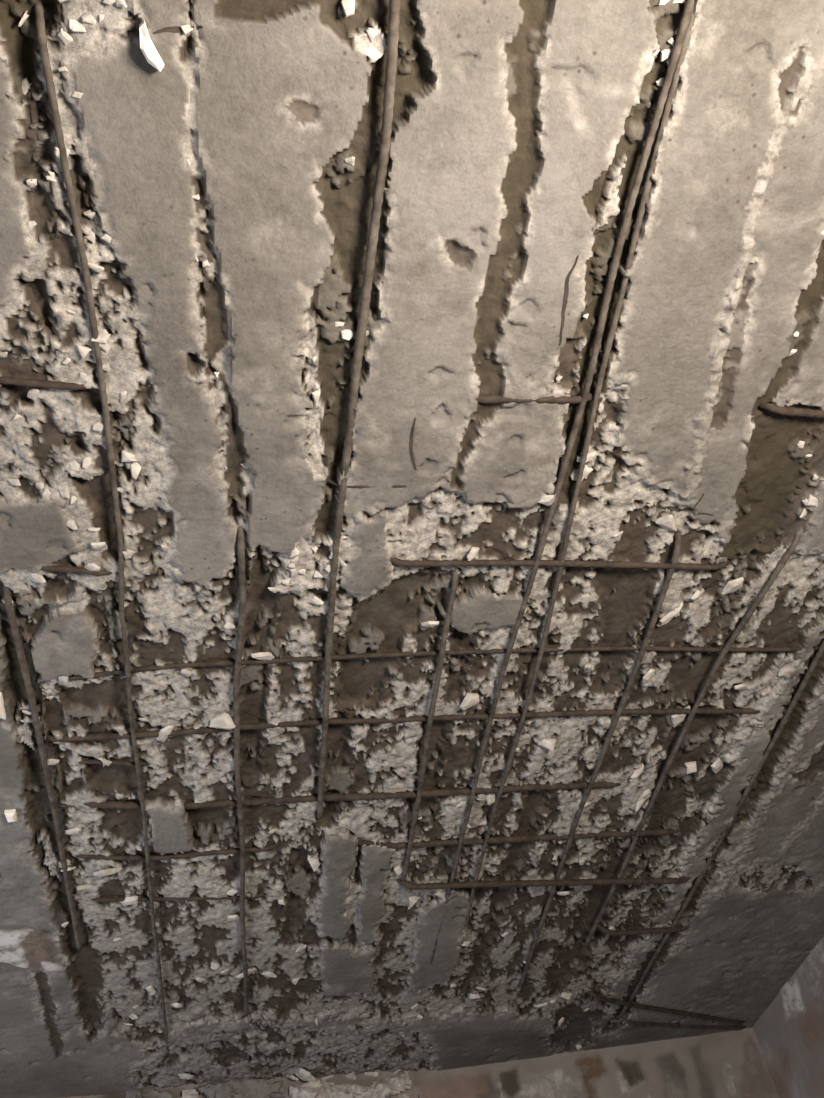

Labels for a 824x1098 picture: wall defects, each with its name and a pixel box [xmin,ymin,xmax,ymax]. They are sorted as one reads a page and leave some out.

spalling [353,0,438,429]
spalling [473,0,556,397]
spalling [551,0,686,396]
spalling [778,47,807,119]
spalling [0,0,389,855]
spalling [0,582,682,1098]
spalling [324,516,533,796]
spalling [364,400,593,561]
spalling [406,240,824,884]
spalling [668,652,824,932]